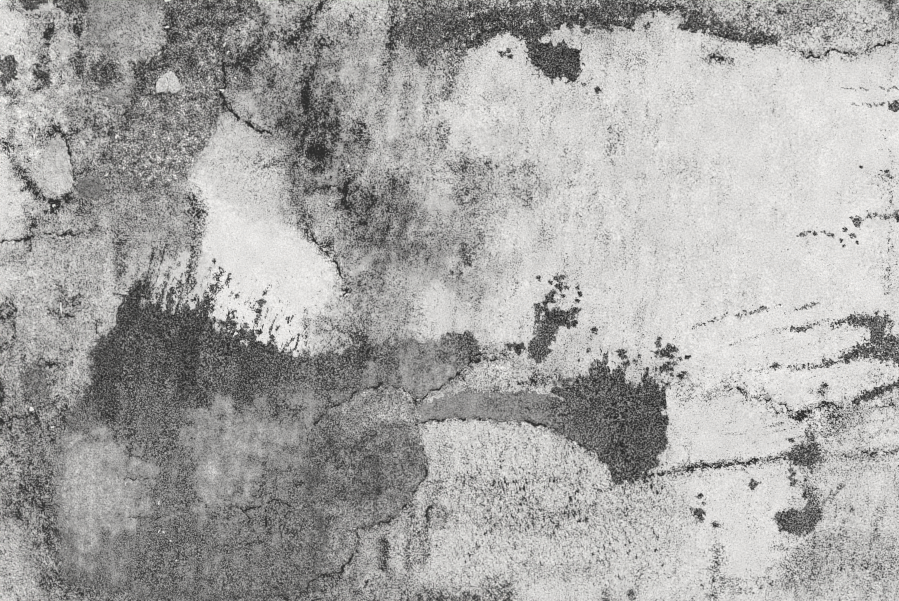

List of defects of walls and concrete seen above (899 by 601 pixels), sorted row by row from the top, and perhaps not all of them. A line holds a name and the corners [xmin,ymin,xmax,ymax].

damp [75,45,121,91]
damp [383,0,795,105]
crack [792,41,897,59]
crack [54,131,74,178]
crack [0,226,90,258]
damp [827,310,895,352]
damp [755,355,846,373]
damp [50,258,691,601]
crack [266,350,608,601]
crack [623,451,794,480]
damp [771,424,845,538]
damp [694,493,718,527]